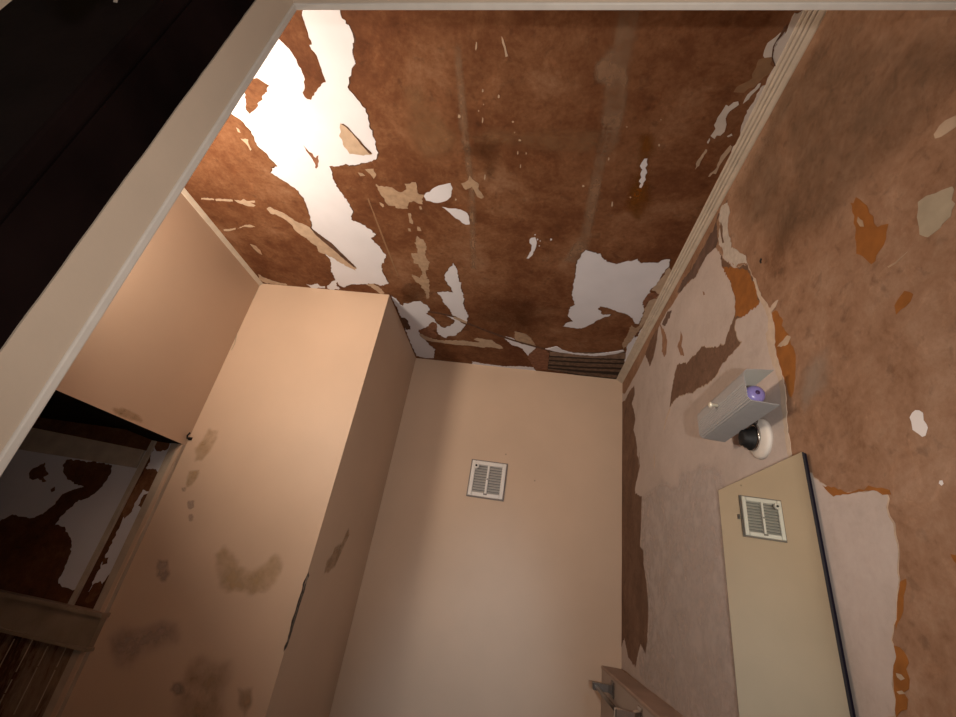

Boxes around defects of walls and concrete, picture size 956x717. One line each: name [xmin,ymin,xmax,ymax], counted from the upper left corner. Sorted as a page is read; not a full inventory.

peeling [707,83,761,143]
peeling [231,10,470,358]
peeling [527,234,552,259]
peeling [639,159,647,188]
peeling [917,187,955,237]
peeling [564,249,671,361]
peeling [472,331,550,371]
flaking render [621,200,792,717]
peeling [910,410,928,437]
peeling [0,442,171,603]
crack [284,572,309,651]
flaking render [810,472,900,717]